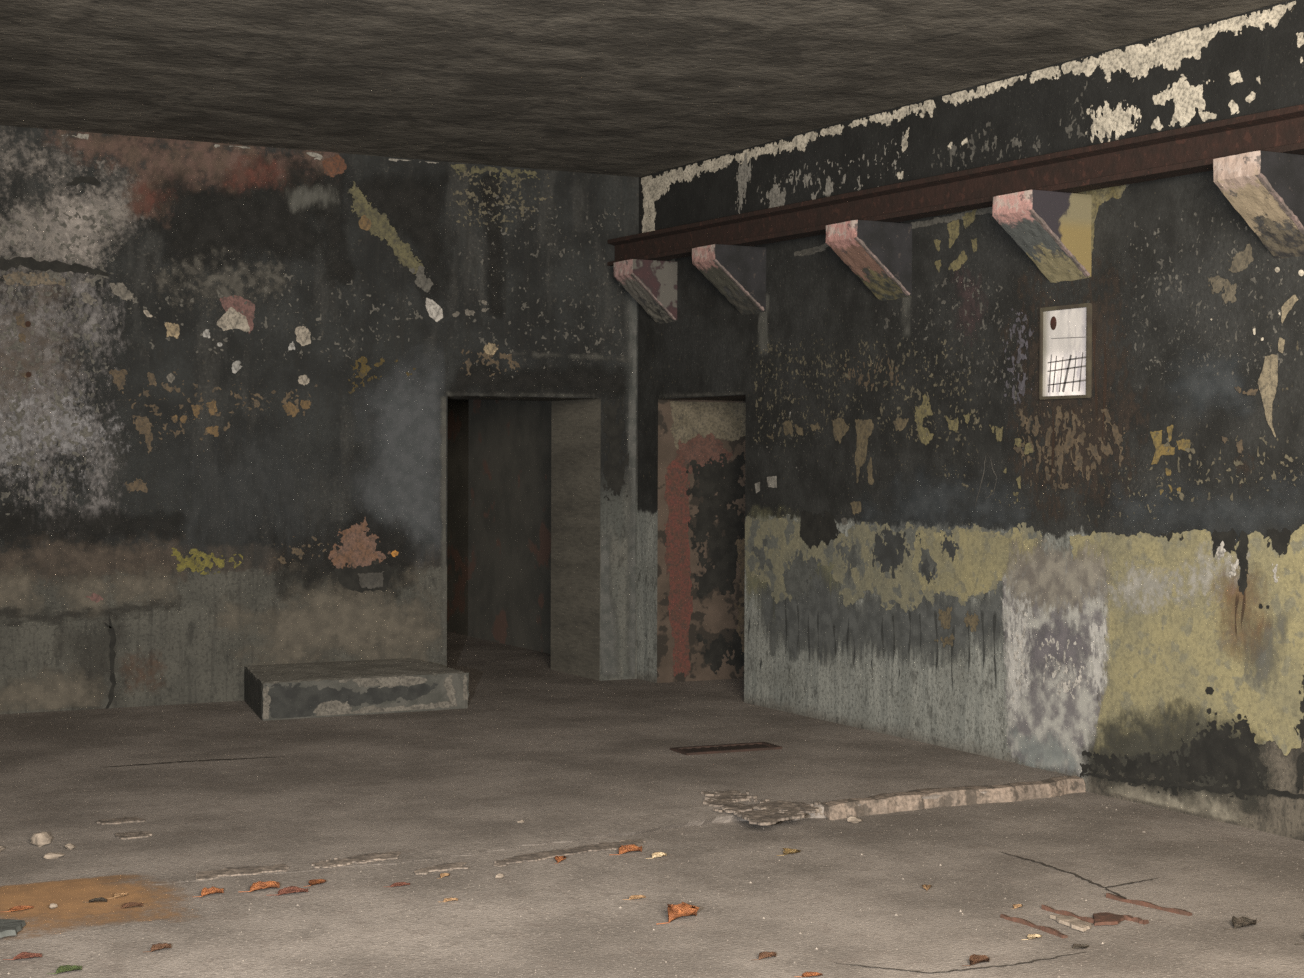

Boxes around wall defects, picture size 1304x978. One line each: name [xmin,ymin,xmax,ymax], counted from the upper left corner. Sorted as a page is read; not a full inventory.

peeling [641,1,1296,233]
peeling [1296,32,1304,63]
crack [0,256,109,281]
water stain [0,133,145,519]
peeling [81,152,628,453]
peeling [664,207,1304,756]
crack [105,615,116,709]
spalling [820,776,1086,820]